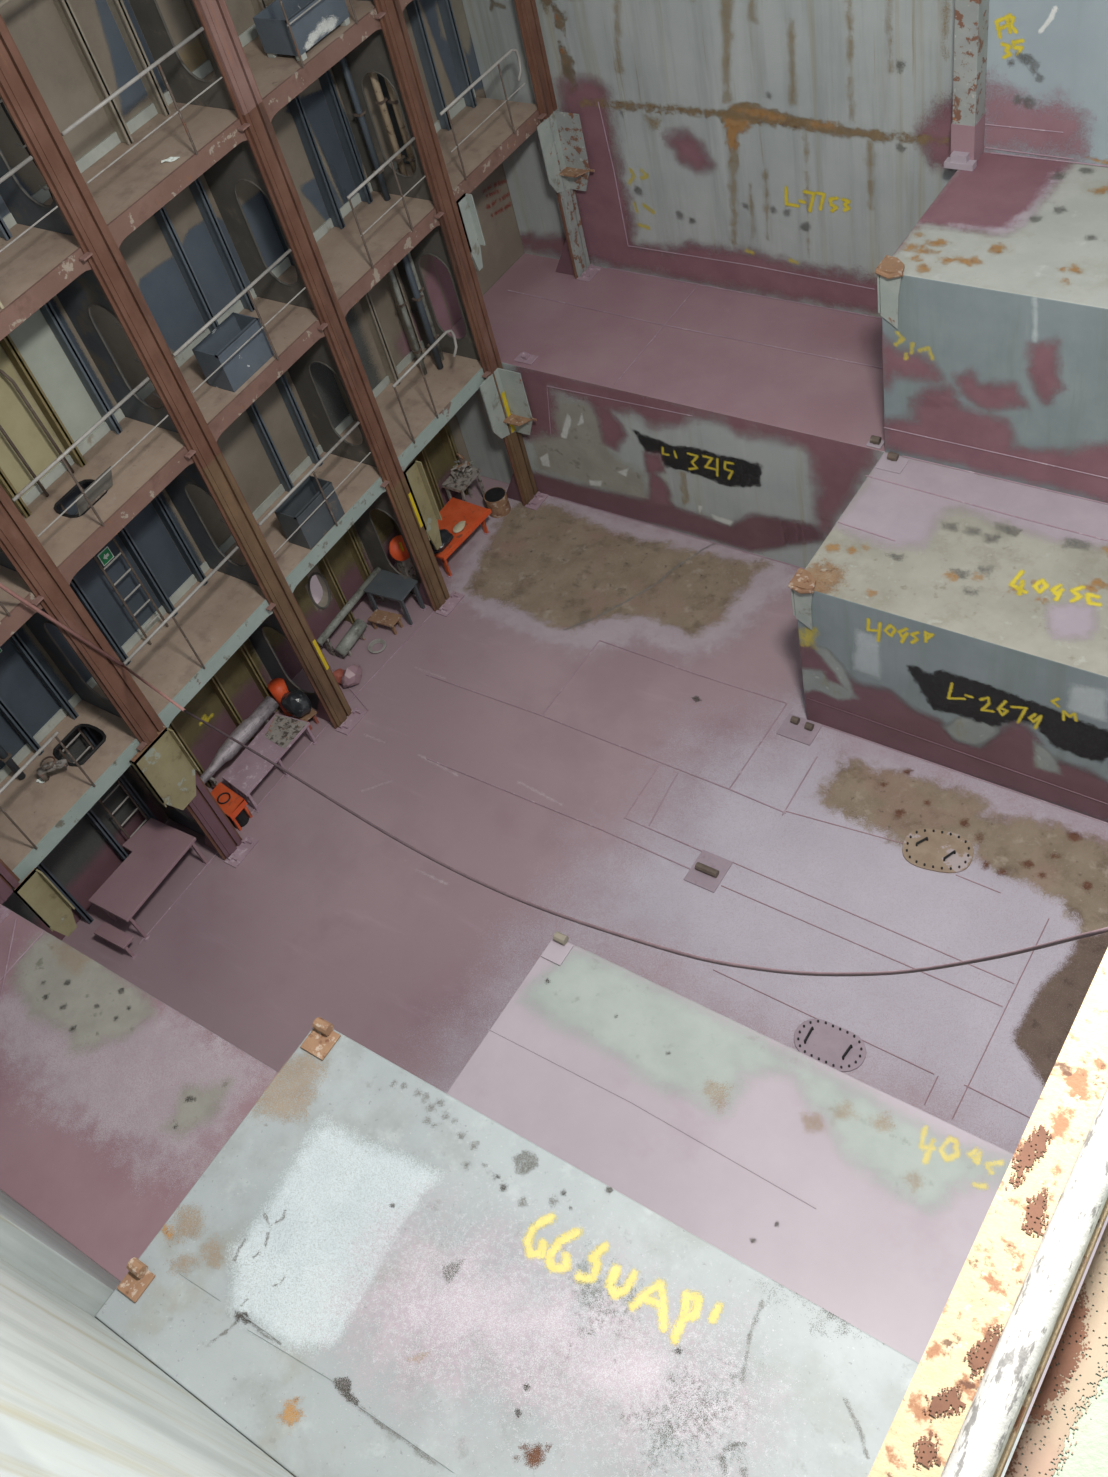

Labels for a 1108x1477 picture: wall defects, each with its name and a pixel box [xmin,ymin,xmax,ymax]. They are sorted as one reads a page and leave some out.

rust [579,0,952,258]
rust [900,232,1013,273]
peeling [697,505,734,526]
peeling [802,628,884,701]
peeling [943,715,999,748]
peeling [1032,742,1060,776]
peeling [1064,683,1108,723]
rust [959,818,1060,879]
rust [1005,1124,1053,1237]
rust [911,1322,1004,1469]